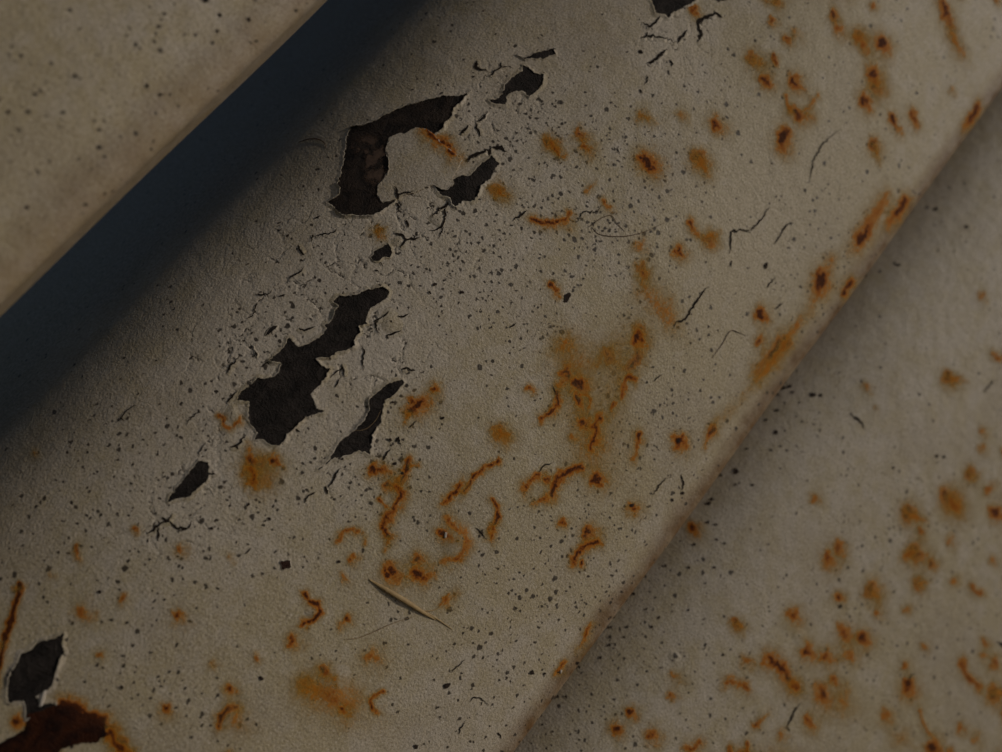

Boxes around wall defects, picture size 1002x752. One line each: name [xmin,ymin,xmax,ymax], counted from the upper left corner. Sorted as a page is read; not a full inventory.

peeling [323,88,502,219]
peeling [477,47,558,123]
corrosion [775,71,820,155]
corrosion [852,191,913,253]
peeling [233,283,393,449]
peeling [314,377,407,473]
corrosion [519,322,649,506]
peeling [164,457,221,505]
corrosion [367,454,503,586]
corrosion [0,581,25,677]
peeling [0,630,109,752]
corrosion [742,622,872,712]